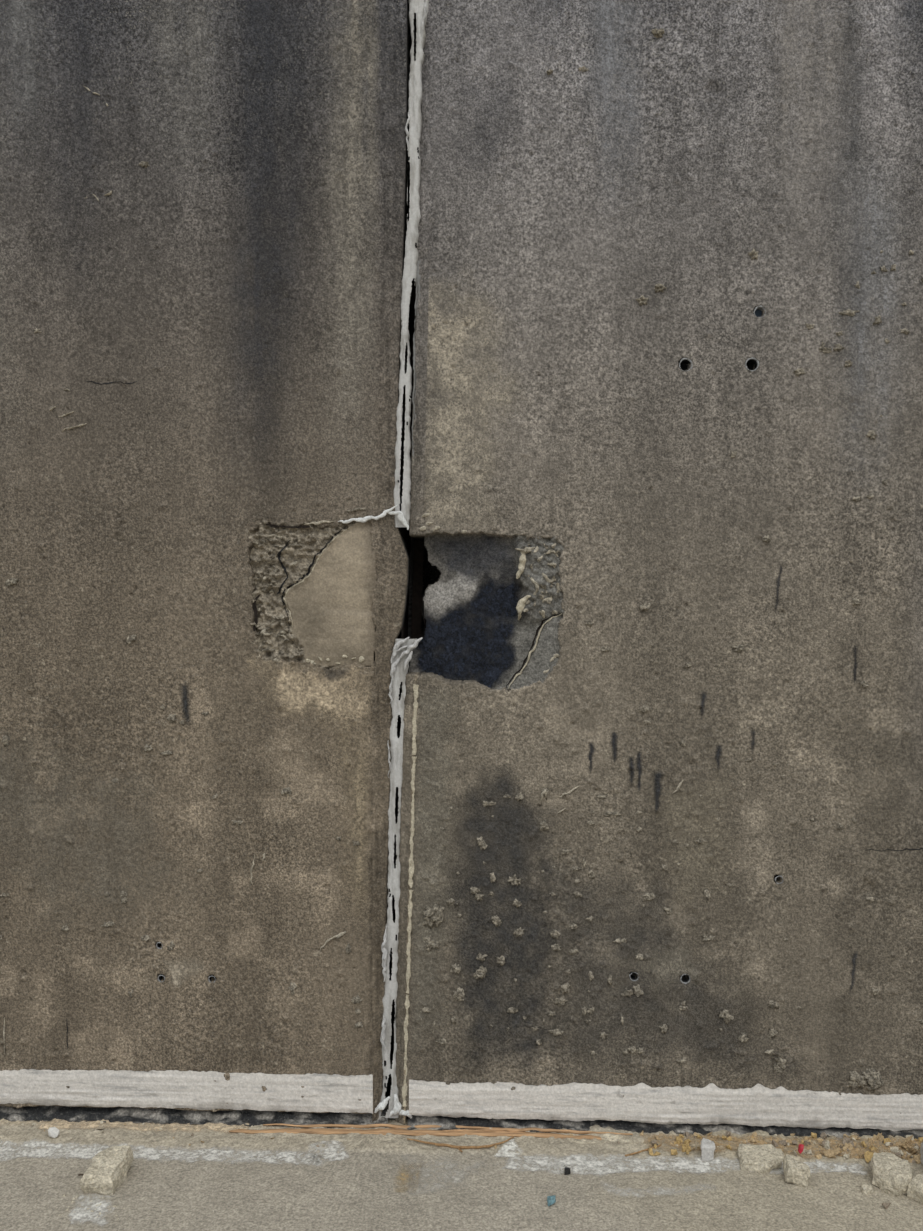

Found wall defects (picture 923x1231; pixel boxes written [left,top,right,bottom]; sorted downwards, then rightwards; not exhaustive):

spalling [239,510,377,677]
spalling [401,513,568,694]
leakage [612,733,662,810]
leakage [460,778,551,1053]